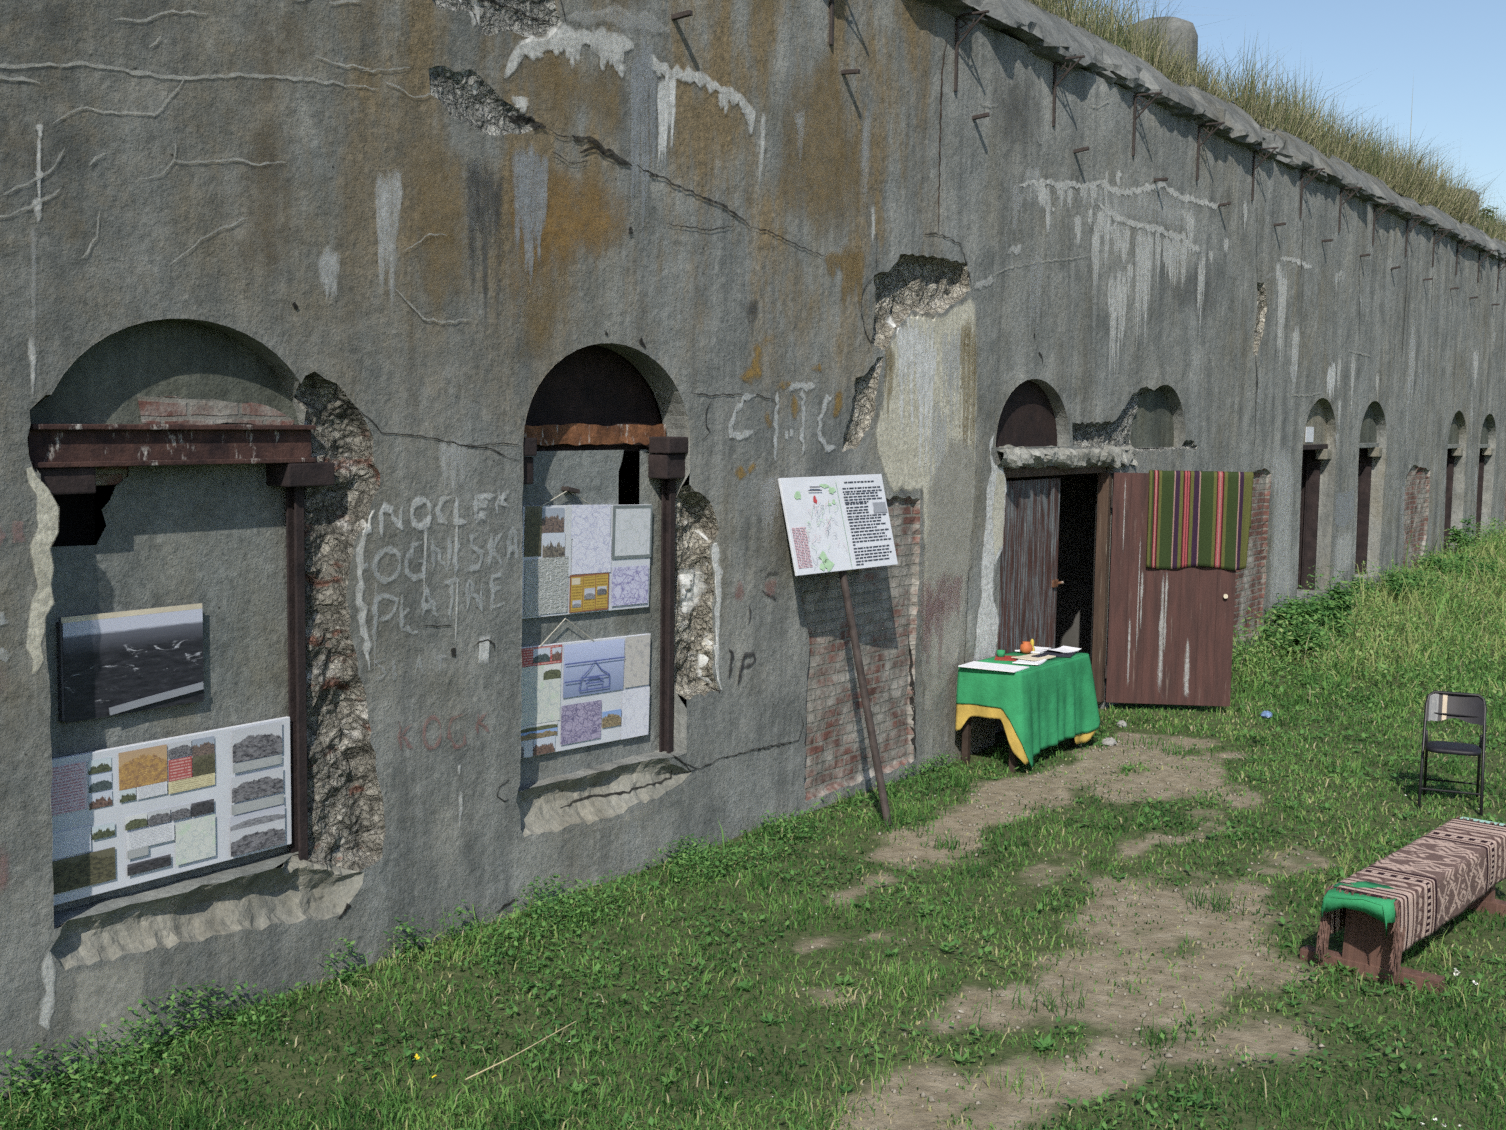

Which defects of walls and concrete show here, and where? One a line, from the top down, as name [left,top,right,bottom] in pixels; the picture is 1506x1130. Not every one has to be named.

spalling [432,0,562,38]
spalling [429,66,536,135]
damp [506,24,765,211]
crack [507,115,826,257]
damp [1019,170,1247,373]
spalling [842,254,970,452]
peeling [992,472,1005,556]
flaking render [801,442,975,802]
crack [560,720,804,808]